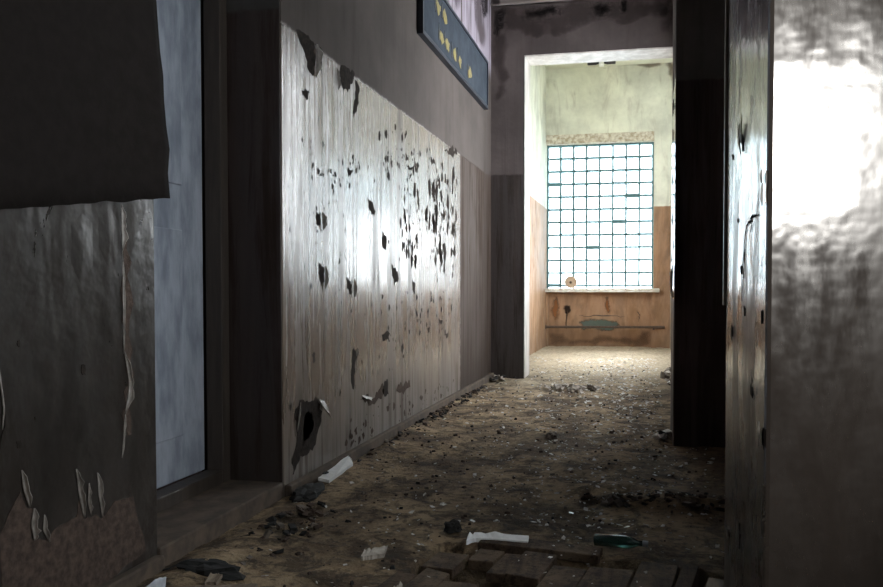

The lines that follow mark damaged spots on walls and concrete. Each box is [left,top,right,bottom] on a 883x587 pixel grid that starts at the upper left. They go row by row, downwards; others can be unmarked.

peeling [296,29,324,77]
peeling [336,65,359,115]
water stain [474,0,507,97]
water stain [502,1,673,37]
peeling [0,0,170,457]
peeling [310,263,358,313]
peeling [302,138,369,233]
peeling [379,124,457,286]
crack [742,214,759,287]
crack [0,373,8,447]
peeling [290,397,332,475]
peeling [345,348,444,446]